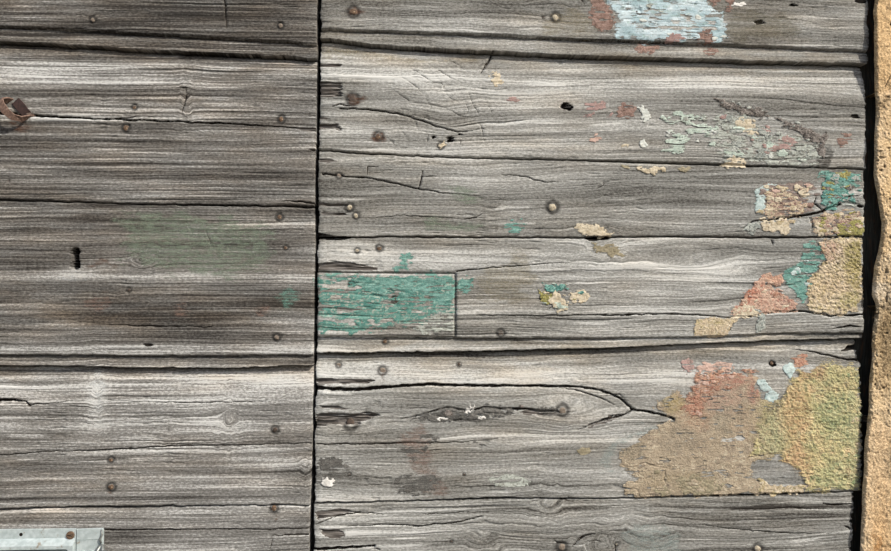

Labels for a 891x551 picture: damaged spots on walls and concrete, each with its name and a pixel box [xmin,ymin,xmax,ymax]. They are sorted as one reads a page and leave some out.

peeling [588,0,746,56]
peeling [574,223,625,258]
peeling [583,98,864,338]
peeling [313,252,474,336]
peeling [538,282,590,313]
crack [0,382,674,455]
peeling [618,354,863,501]
crack [104,511,481,551]
crack [554,533,616,551]